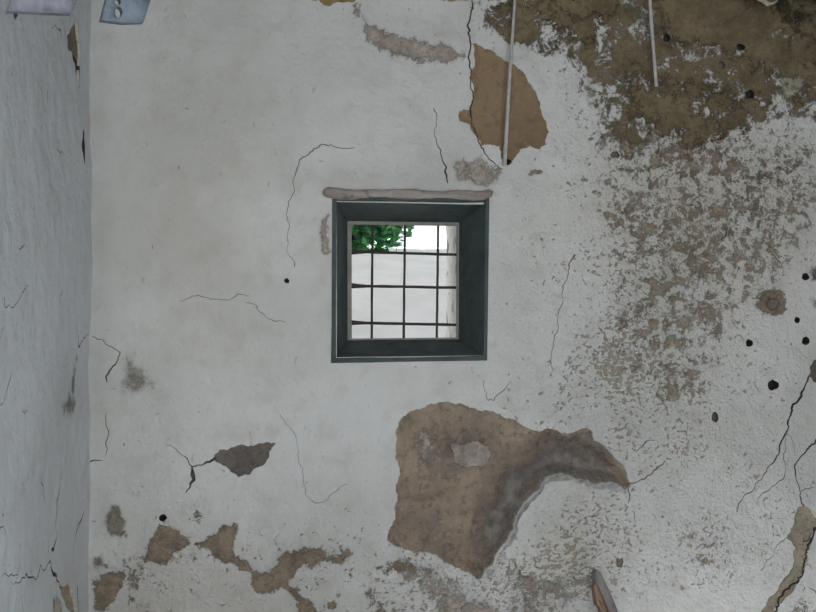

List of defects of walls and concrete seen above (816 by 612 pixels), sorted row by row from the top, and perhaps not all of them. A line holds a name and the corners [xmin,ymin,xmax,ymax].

flaking render [312,0,548,165]
crack [433,108,448,183]
crack [467,0,503,170]
leakage [654,0,816,101]
peeling [581,133,816,406]
crack [2,429,84,606]
flaking render [214,442,275,477]
peeling [195,523,354,612]
flaking render [363,402,629,612]
crack [737,376,816,508]
flaking render [761,505,816,612]
crack [763,527,816,612]